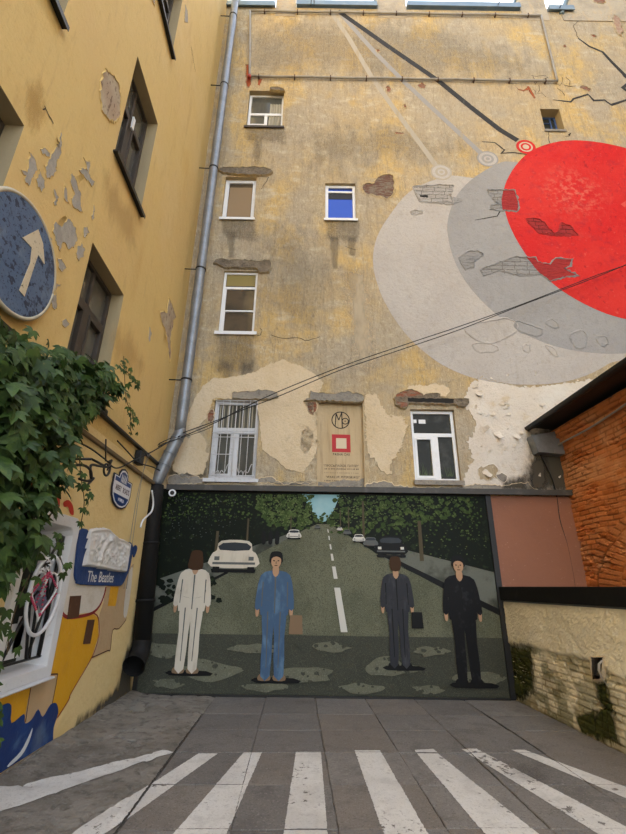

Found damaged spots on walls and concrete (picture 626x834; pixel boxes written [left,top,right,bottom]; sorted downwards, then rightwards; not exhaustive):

flaking render [99,67,121,125]
peeling [21,132,95,272]
flaking render [360,173,396,201]
flaking render [159,297,176,363]
flaking render [167,359,598,489]